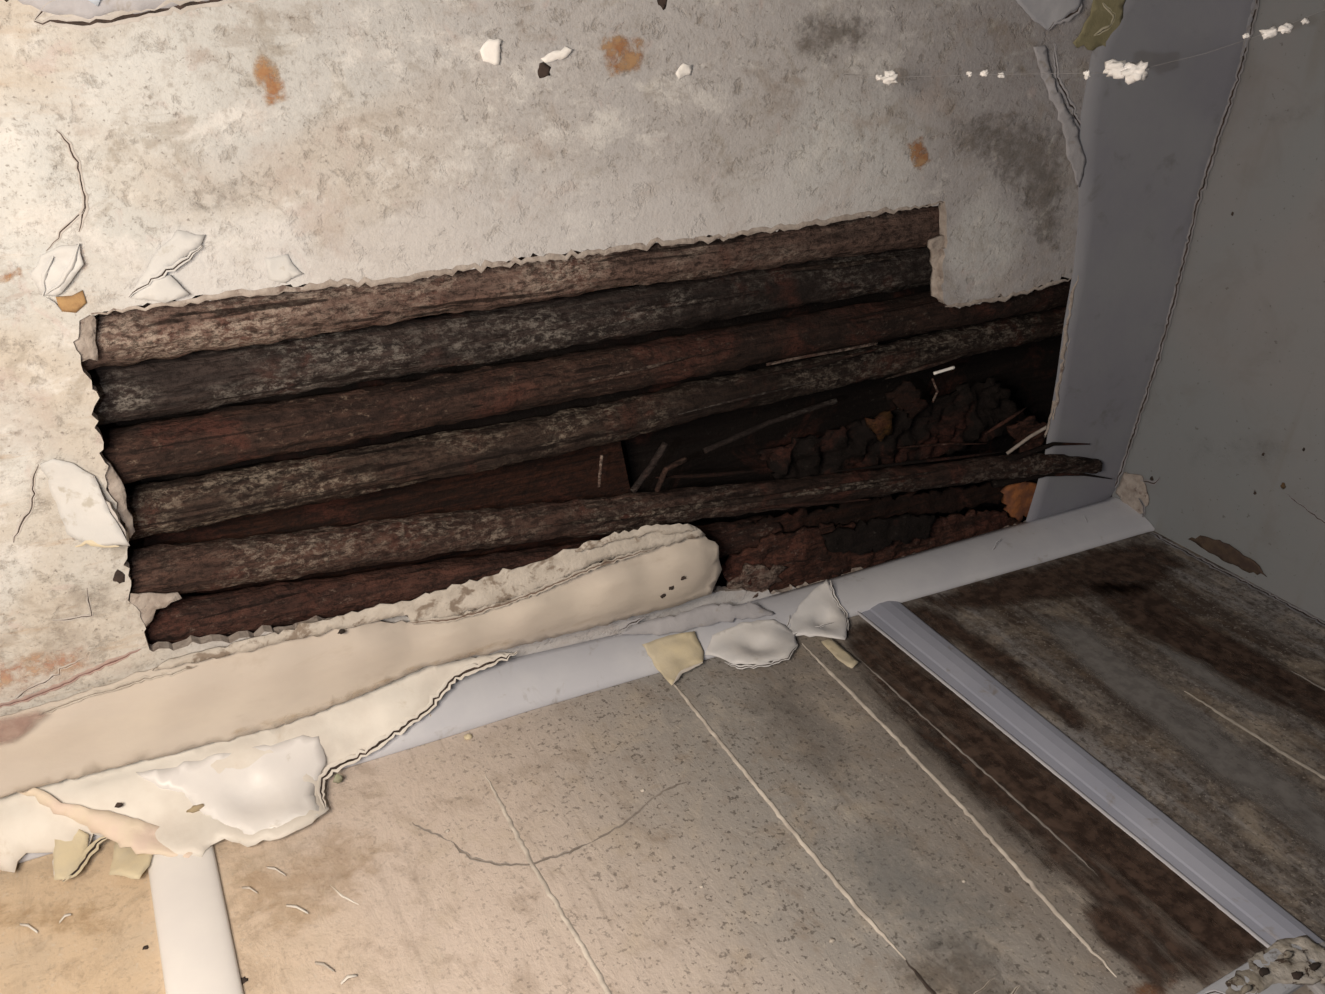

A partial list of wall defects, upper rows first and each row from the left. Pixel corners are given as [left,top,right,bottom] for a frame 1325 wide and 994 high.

corrosion [255,57,283,104]
corrosion [602,36,642,73]
crack [46,130,89,252]
spalling [30,201,943,362]
spalling [927,235,1079,437]
spalling [113,569,182,627]
peeling [616,579,858,685]
damp [908,544,1325,730]
peeling [0,652,514,882]
crack [412,781,688,866]
damp [847,624,1265,987]
damp [1056,624,1325,850]